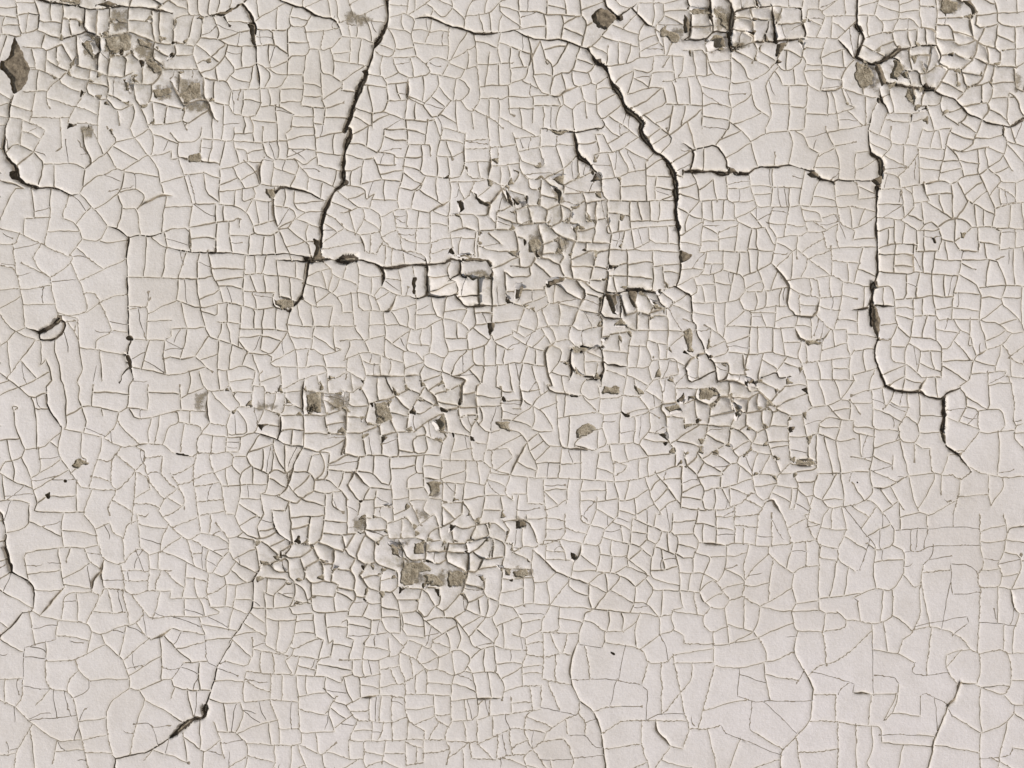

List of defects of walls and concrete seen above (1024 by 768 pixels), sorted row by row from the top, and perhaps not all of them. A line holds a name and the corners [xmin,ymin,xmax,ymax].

spalling [0,37,30,94]
peeling [52,1,188,108]
crack [684,0,807,52]
peeling [474,156,625,259]
crack [538,250,684,388]
peeling [225,376,479,443]
crack [615,354,735,471]
peeling [659,367,808,466]
crack [0,302,229,768]
crack [131,226,649,768]
peeling [361,503,527,602]
crack [96,611,272,768]